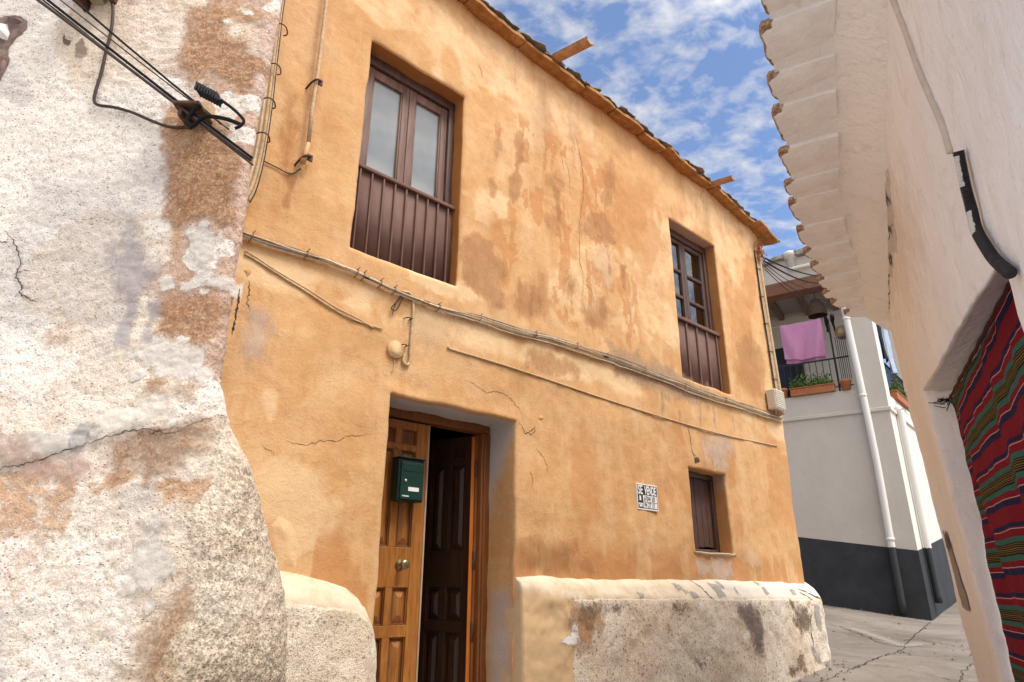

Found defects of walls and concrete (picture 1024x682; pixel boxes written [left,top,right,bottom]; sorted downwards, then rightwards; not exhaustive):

spalling [0,15,28,80]
crack [0,231,38,303]
peeling [158,220,251,297]
crack [0,415,224,470]
crack [262,433,370,456]
crack [464,380,548,488]
leakage [736,602,765,657]
leakage [788,654,807,677]
leakage [789,598,810,634]
crack [800,589,973,682]